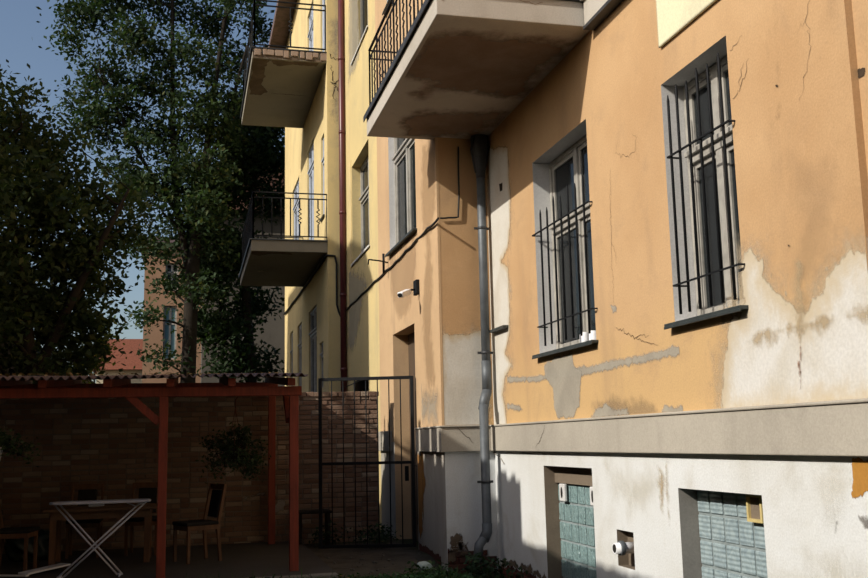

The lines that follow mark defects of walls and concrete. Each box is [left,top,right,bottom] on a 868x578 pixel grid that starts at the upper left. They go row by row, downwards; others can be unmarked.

peeling [443,146,512,425]
peeling [717,237,868,408]
spalling [419,533,546,578]
peeling [851,457,868,499]